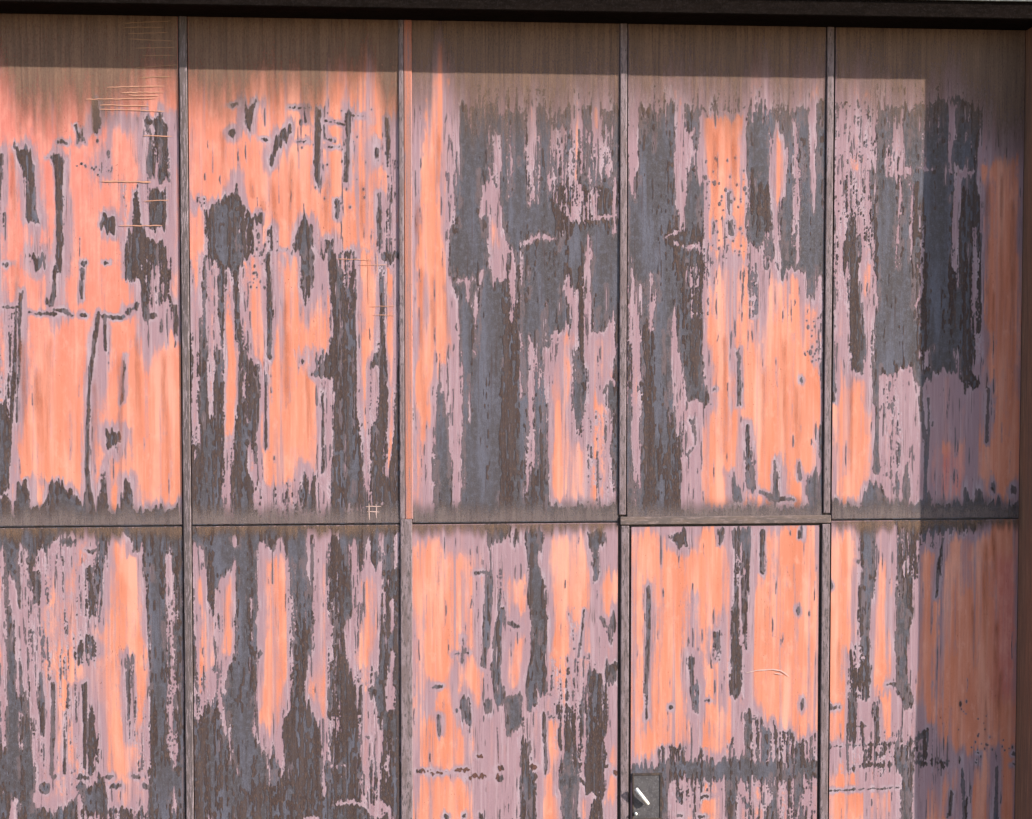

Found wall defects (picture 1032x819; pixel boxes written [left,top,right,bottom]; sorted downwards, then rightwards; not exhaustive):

peeling [0,99,413,819]
peeling [413,83,1007,819]